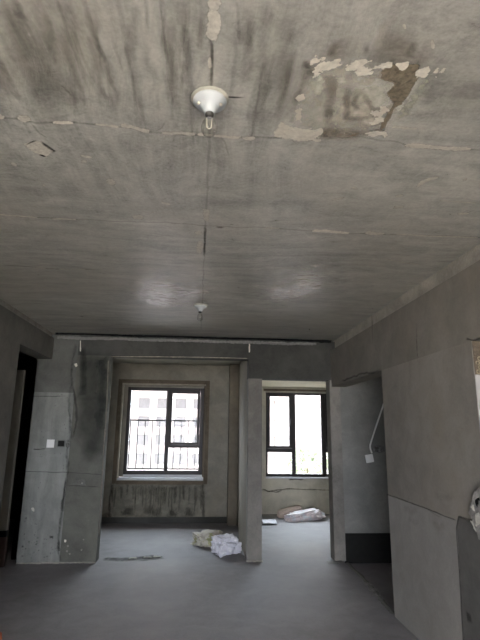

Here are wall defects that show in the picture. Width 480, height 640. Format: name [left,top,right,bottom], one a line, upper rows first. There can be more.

crack [206,0,222,41]
peeling [274,55,446,142]
crack [53,118,74,126]
crack [95,123,255,141]
crack [391,126,471,151]